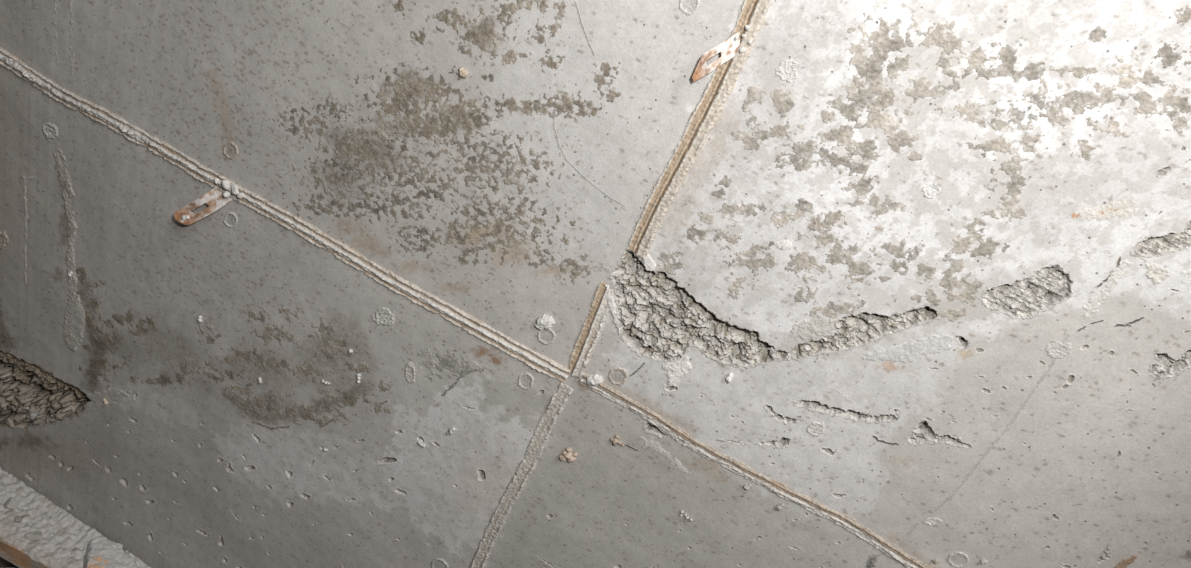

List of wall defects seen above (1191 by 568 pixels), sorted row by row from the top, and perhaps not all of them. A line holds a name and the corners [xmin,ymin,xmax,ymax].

spalling [260,0,1191,369]
peeling [0,265,405,446]
spalling [1126,329,1191,389]
spalling [714,398,901,466]
spalling [905,410,973,449]